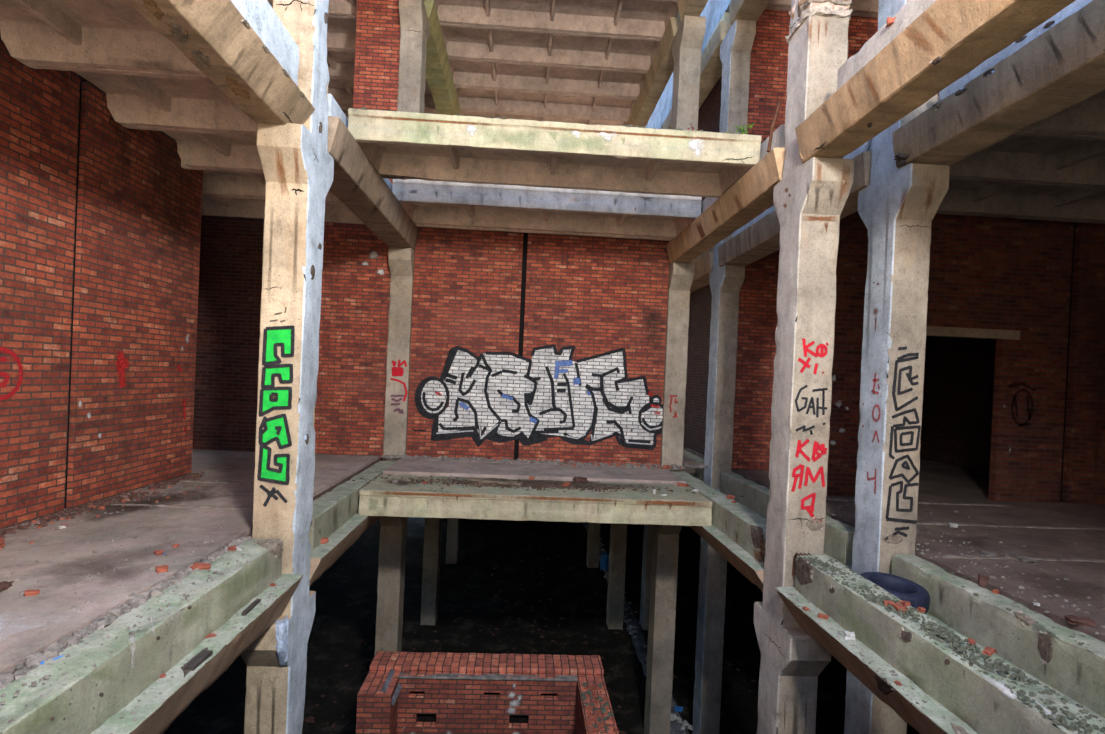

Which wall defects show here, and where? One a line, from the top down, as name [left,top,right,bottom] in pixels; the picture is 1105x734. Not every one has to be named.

water stain [689,139,703,155]
spalling [792,552,813,586]
flaking render [275,615,289,667]